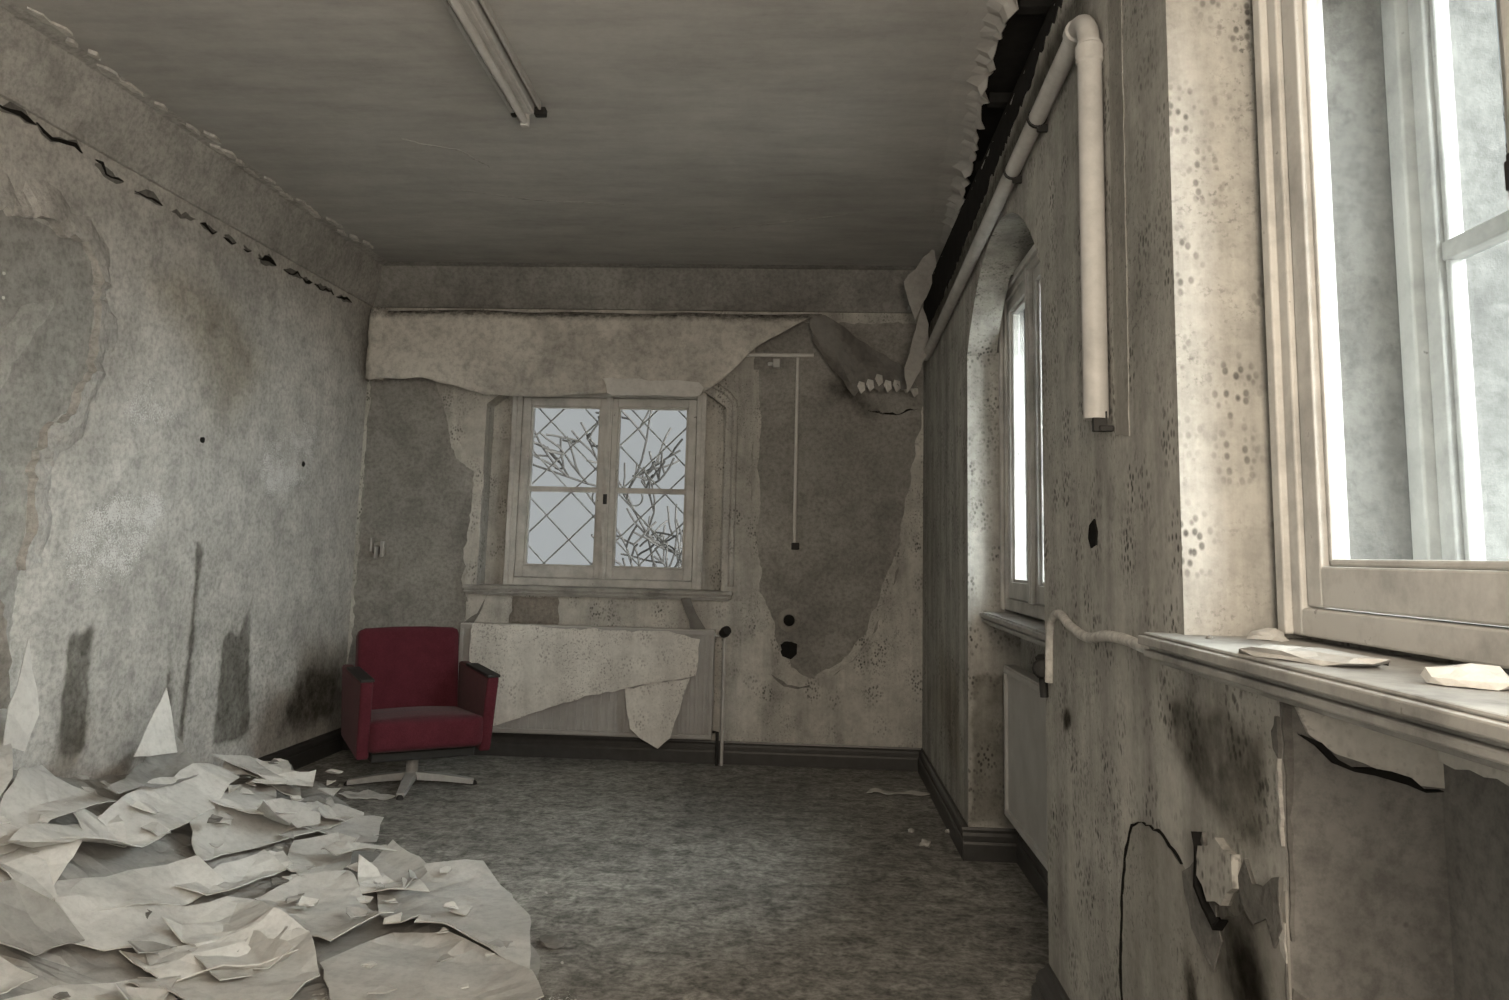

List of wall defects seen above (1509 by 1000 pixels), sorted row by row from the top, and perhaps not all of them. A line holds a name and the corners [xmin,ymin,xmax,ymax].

crack [0,102,352,303]
peeling [0,173,119,709]
peeling [750,322,923,689]
peeling [509,596,559,625]
spalling [1271,716,1285,846]
peeling [1119,821,1292,1000]